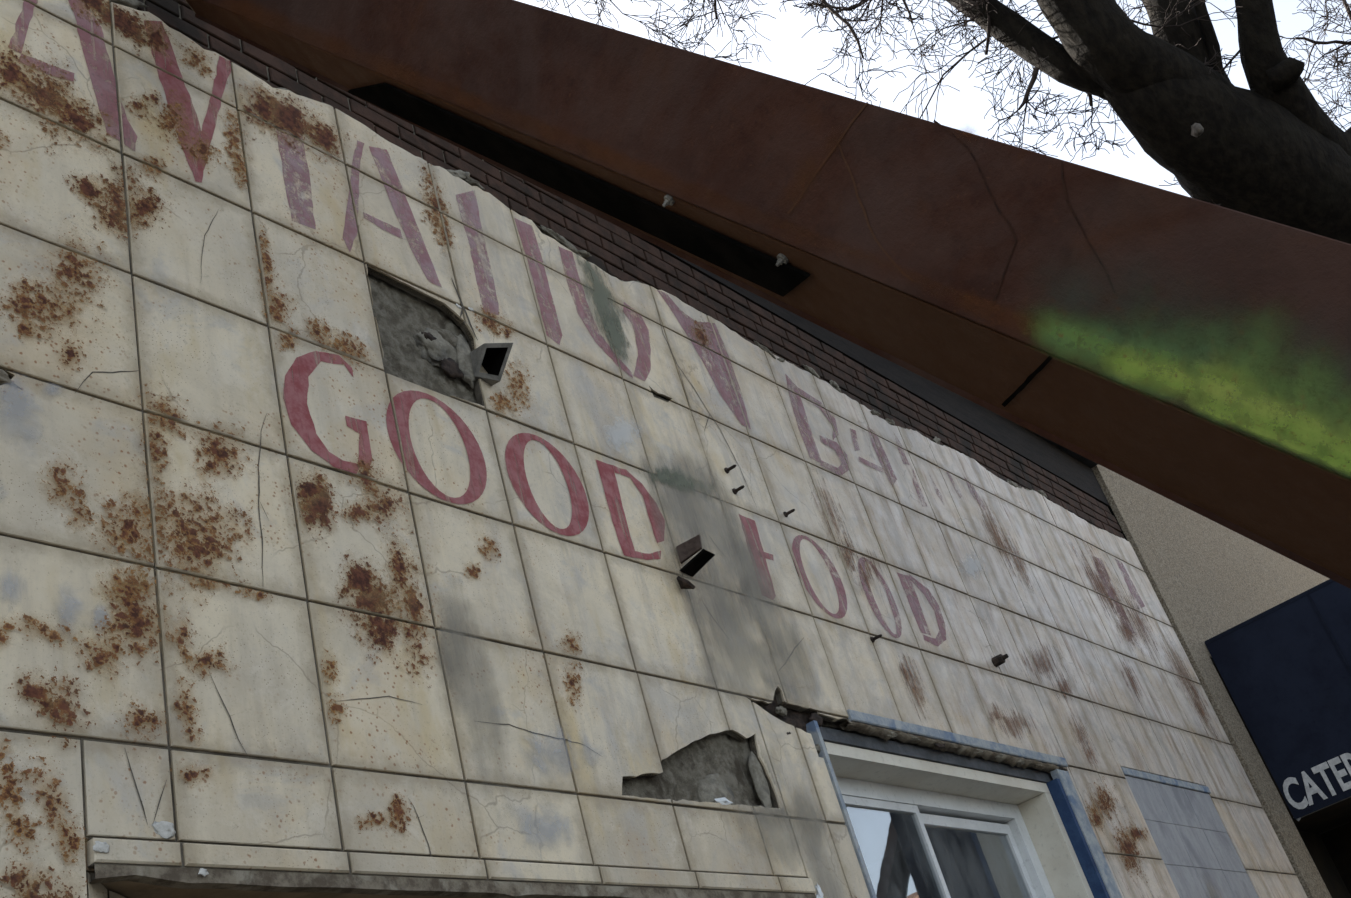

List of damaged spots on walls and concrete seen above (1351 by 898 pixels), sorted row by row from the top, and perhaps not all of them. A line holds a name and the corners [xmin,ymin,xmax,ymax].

corrosion [0,0,350,376]
corrosion [252,219,376,370]
peeling [367,274,477,403]
corrosion [0,381,285,898]
corrosion [289,453,438,688]
peeling [151,821,176,839]
corrosion [354,788,417,836]
spalling [622,733,772,809]
corrosion [1022,646,1151,884]